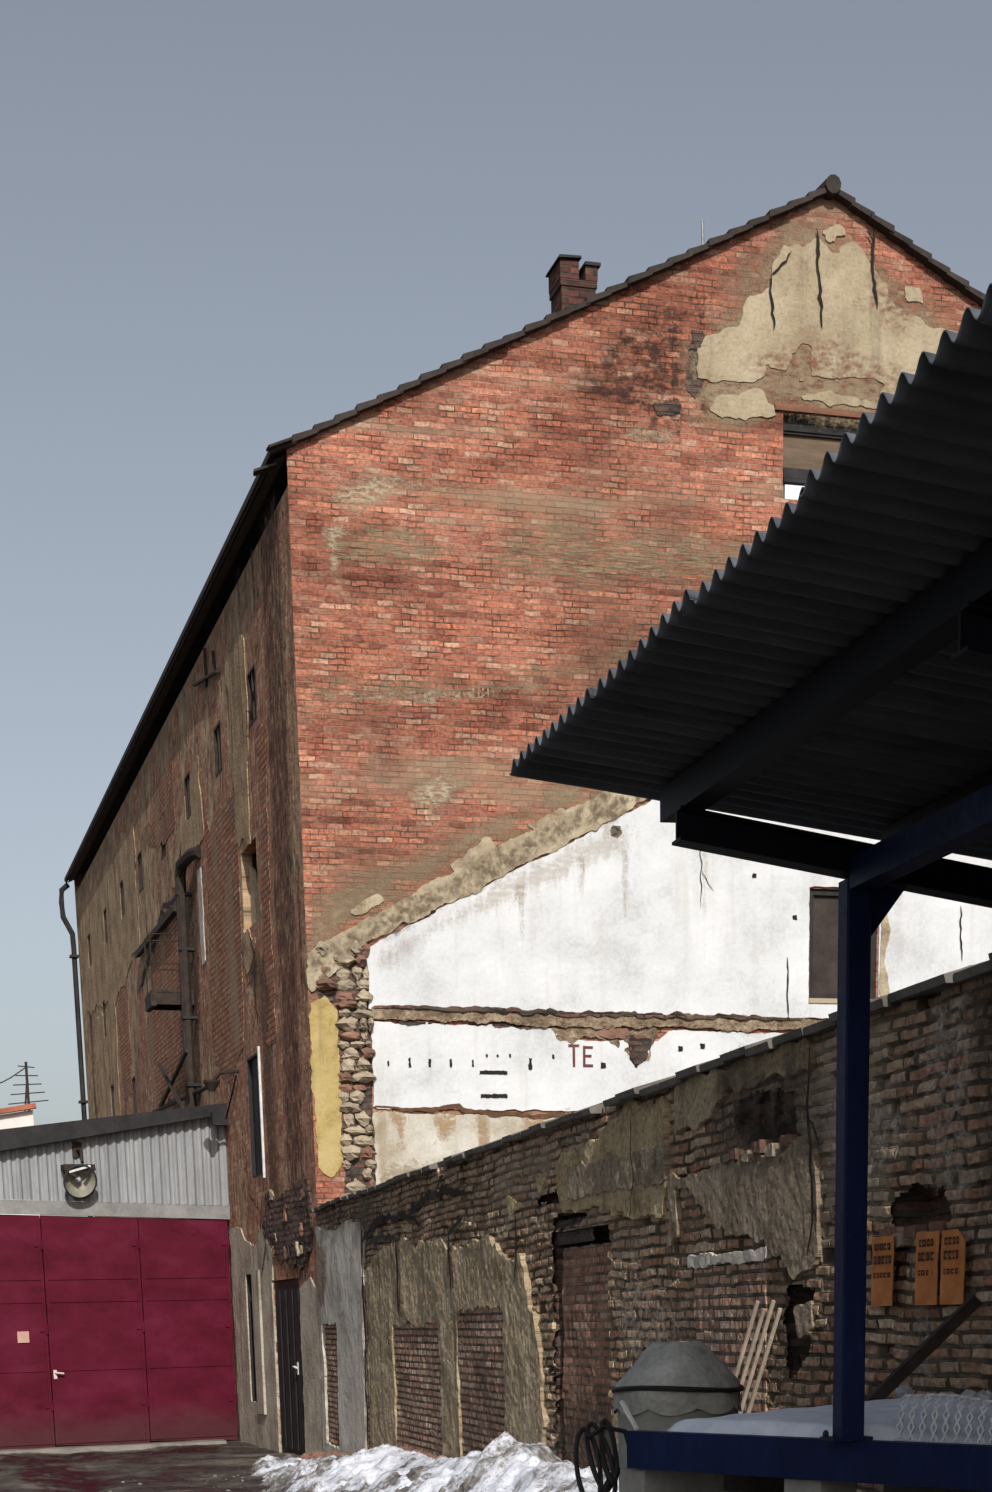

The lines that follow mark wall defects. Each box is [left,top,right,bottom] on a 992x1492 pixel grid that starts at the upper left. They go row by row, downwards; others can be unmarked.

crack [769,228,823,328]
crack [865,228,878,308]
peeling [653,218,956,430]
peeling [450,837,497,872]
spalling [610,825,622,838]
spalling [550,1026,658,1068]
spalling [262,941,389,1270]
peeling [365,1037,832,1460]
spalling [880,1183,952,1249]